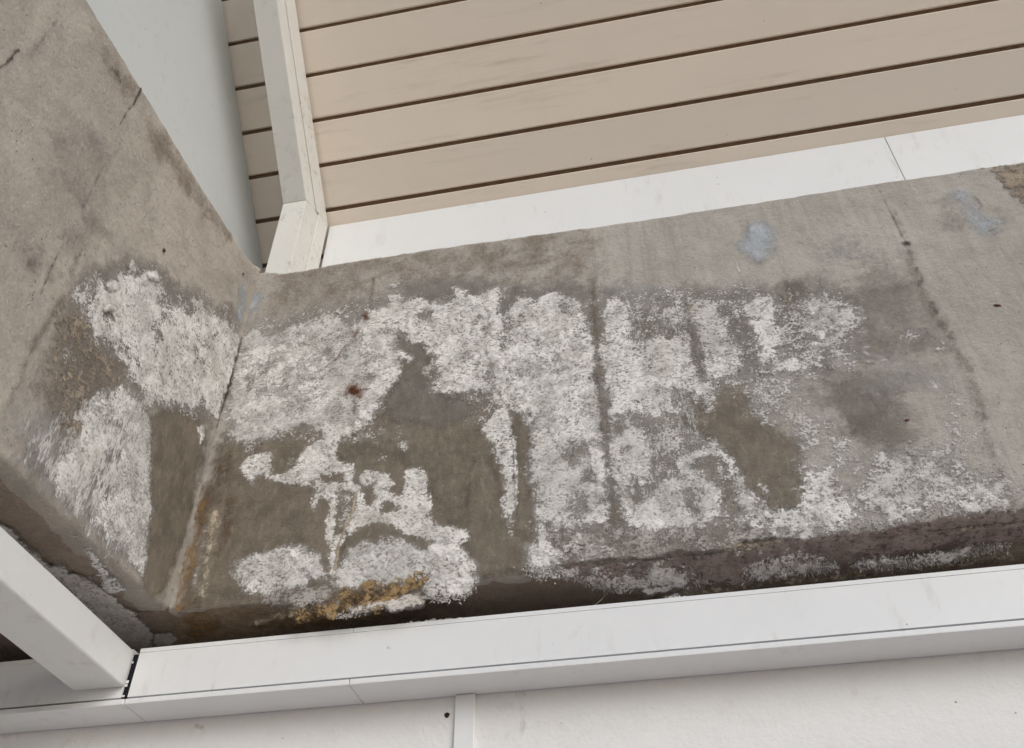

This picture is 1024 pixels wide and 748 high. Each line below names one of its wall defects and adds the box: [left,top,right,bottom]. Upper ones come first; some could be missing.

rust [345,384,371,406]
water stain [18,235,1024,624]
rust [170,455,424,644]